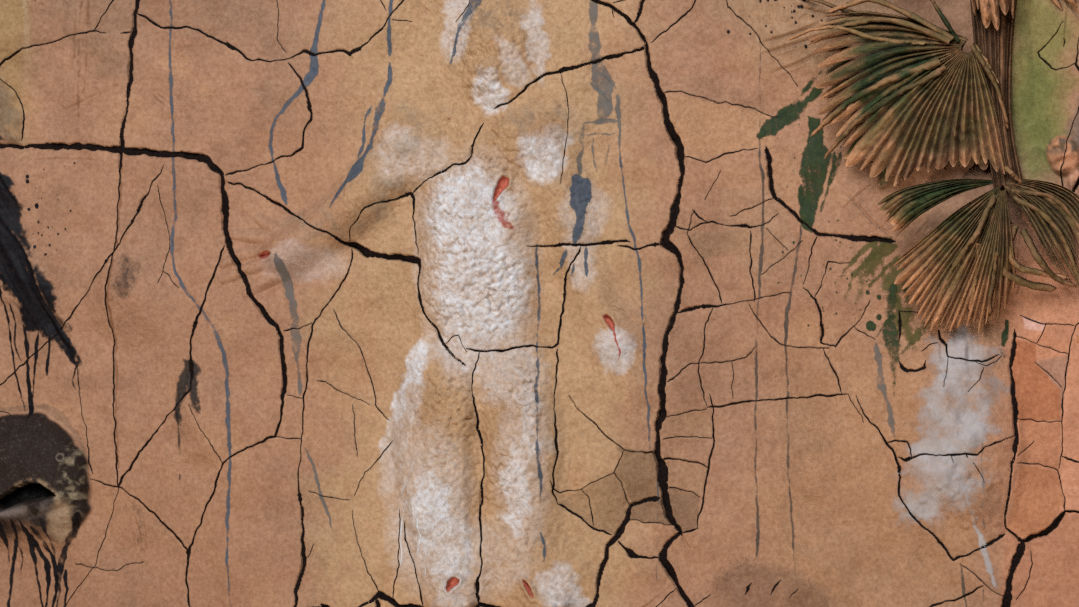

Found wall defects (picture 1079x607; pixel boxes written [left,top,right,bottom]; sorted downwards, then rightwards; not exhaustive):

water stain [268,0,325,205]
water stain [329,0,393,208]
water stain [0,288,77,419]
crack [0,0,630,607]
crack [494,0,1079,607]
water stain [874,315,895,437]
water stain [905,328,987,518]
water stain [976,522,995,594]